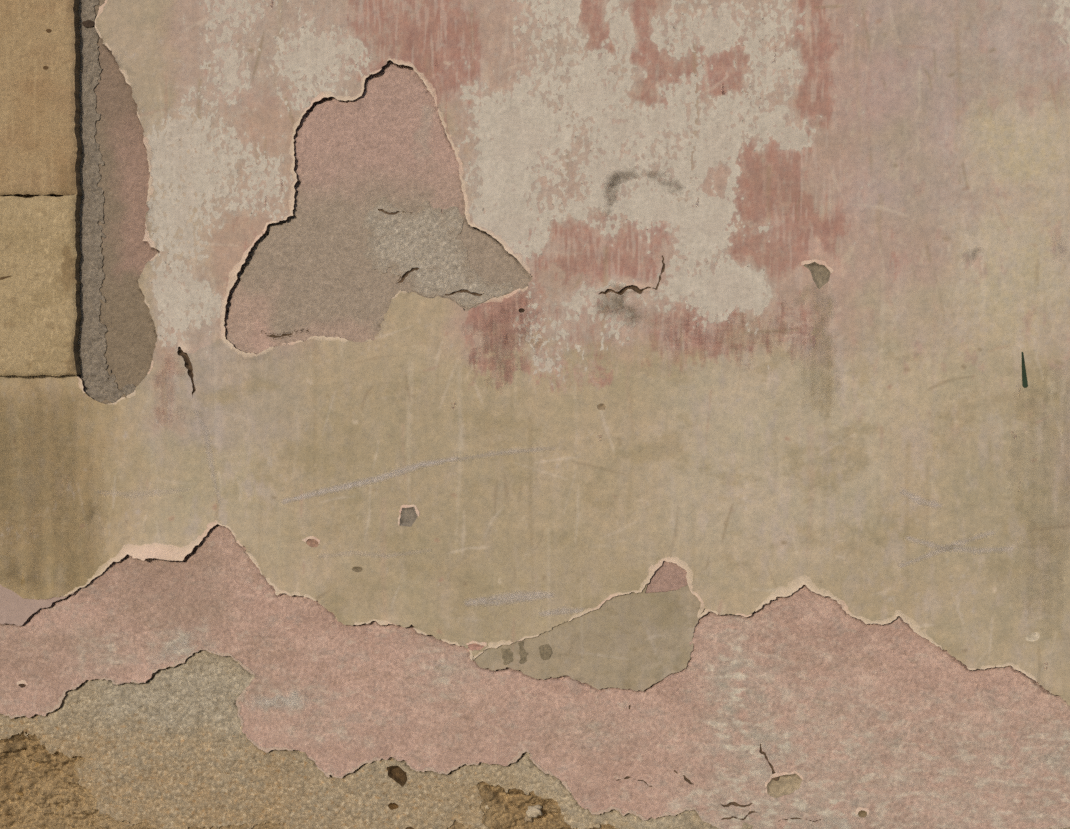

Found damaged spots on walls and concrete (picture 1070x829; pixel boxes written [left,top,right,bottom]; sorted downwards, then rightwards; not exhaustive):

peeling [77,0,822,405]
crack [599,255,665,295]
peeling [801,259,834,289]
crack [178,347,196,395]
peeling [398,504,420,527]
peeling [0,520,1070,829]